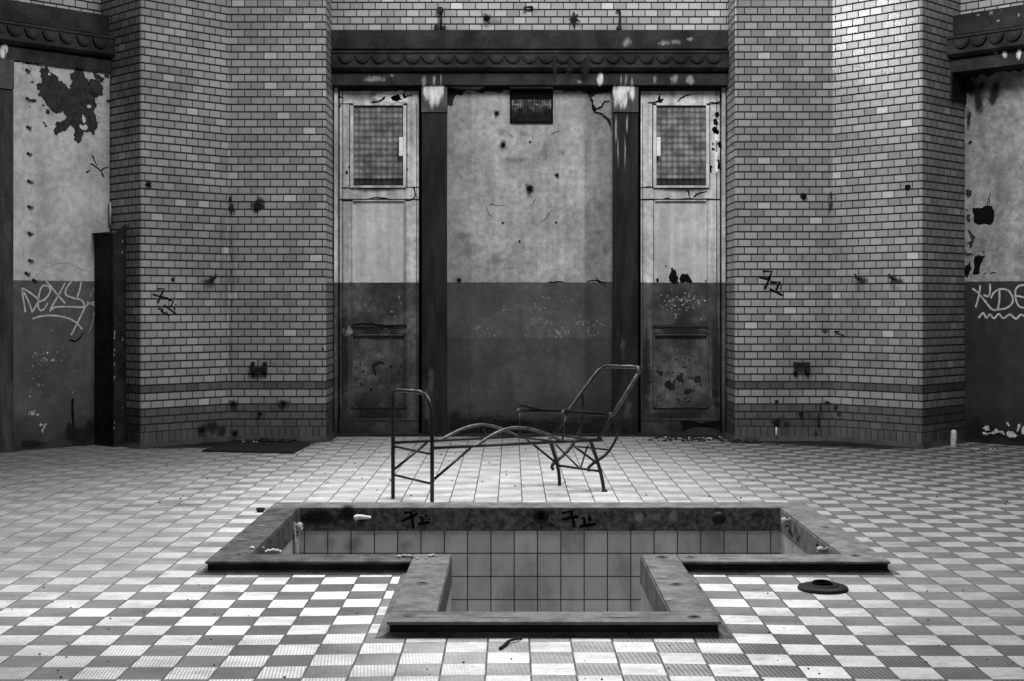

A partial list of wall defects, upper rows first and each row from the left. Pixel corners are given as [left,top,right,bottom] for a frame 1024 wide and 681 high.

peeling [25,62,110,143]
crack [590,98,612,130]
crack [86,155,109,177]
peeling [965,189,985,256]
peeling [656,266,706,320]
peeling [642,345,720,407]
spalling [982,422,1024,438]